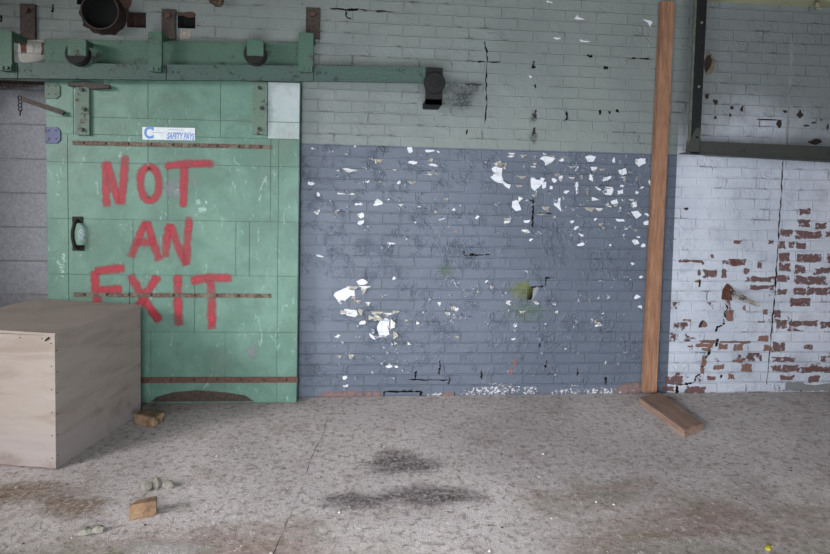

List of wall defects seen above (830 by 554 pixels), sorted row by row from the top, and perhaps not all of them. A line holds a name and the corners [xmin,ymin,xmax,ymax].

peeling [18,40,44,63]
crack [465,42,500,134]
peeling [328,189,372,231]
peeling [407,147,444,175]
peeling [485,153,650,247]
flaking render [679,208,830,307]
crack [766,162,783,385]
peeling [334,279,411,379]
peeling [427,359,539,396]
crack [675,303,728,393]
flaking render [662,335,830,393]
flaking render [758,309,830,329]